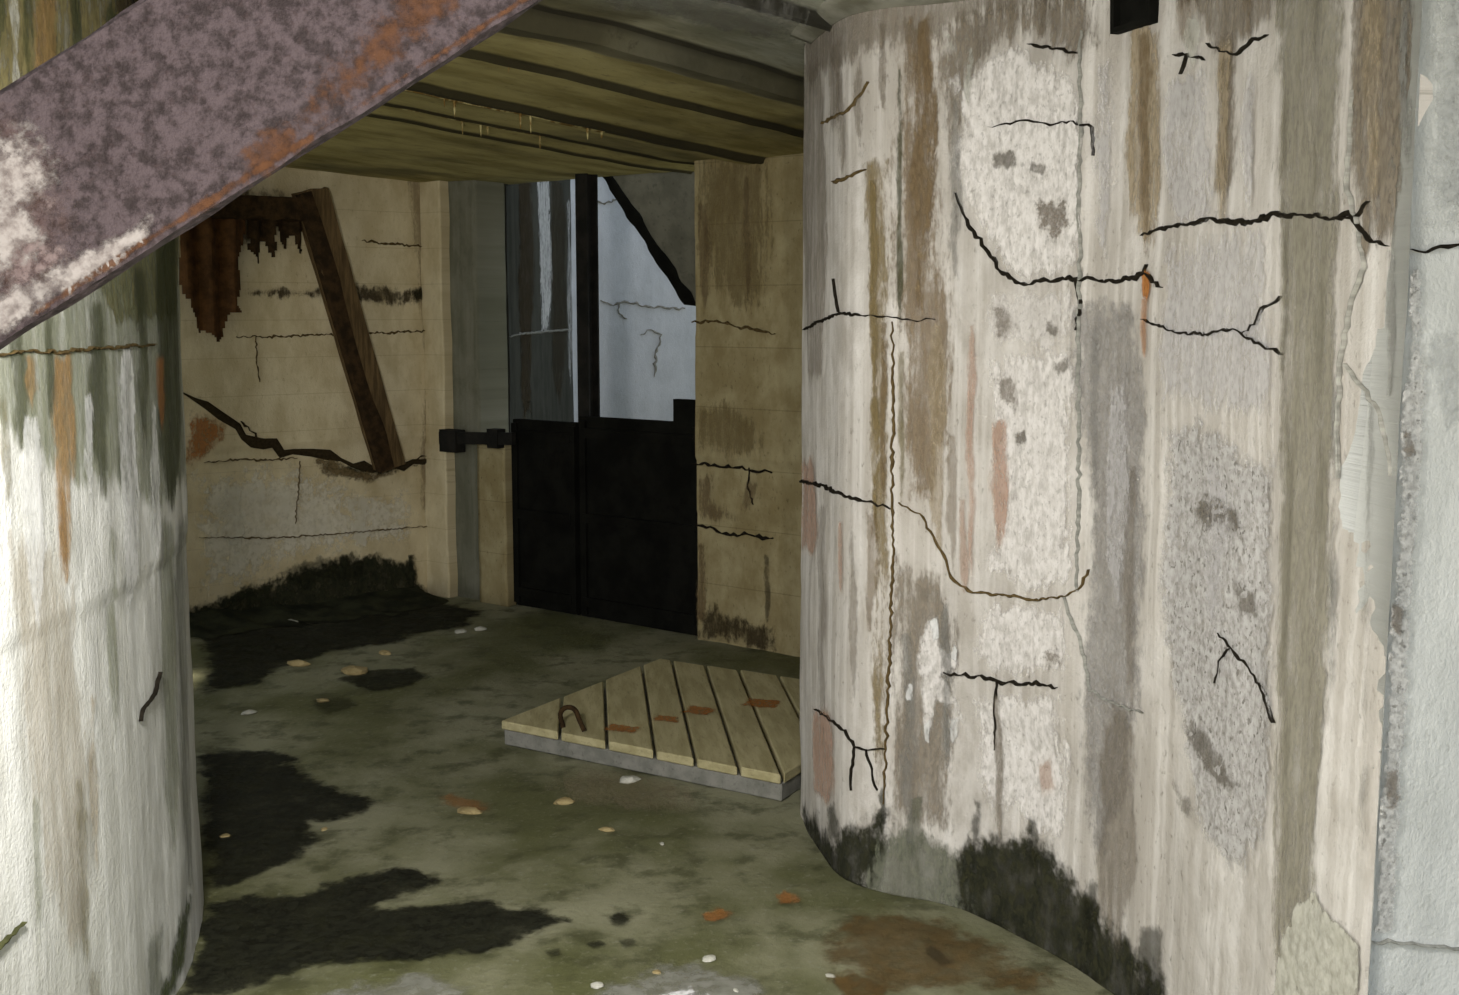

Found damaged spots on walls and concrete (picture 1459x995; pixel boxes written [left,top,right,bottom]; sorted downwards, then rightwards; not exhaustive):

rust [35,233,158,313]
rust [175,134,314,342]
rust [54,355,75,580]
rust [186,418,223,460]
crack [183,392,427,539]
crack [600,30,1459,805]
crack [0,922,27,950]